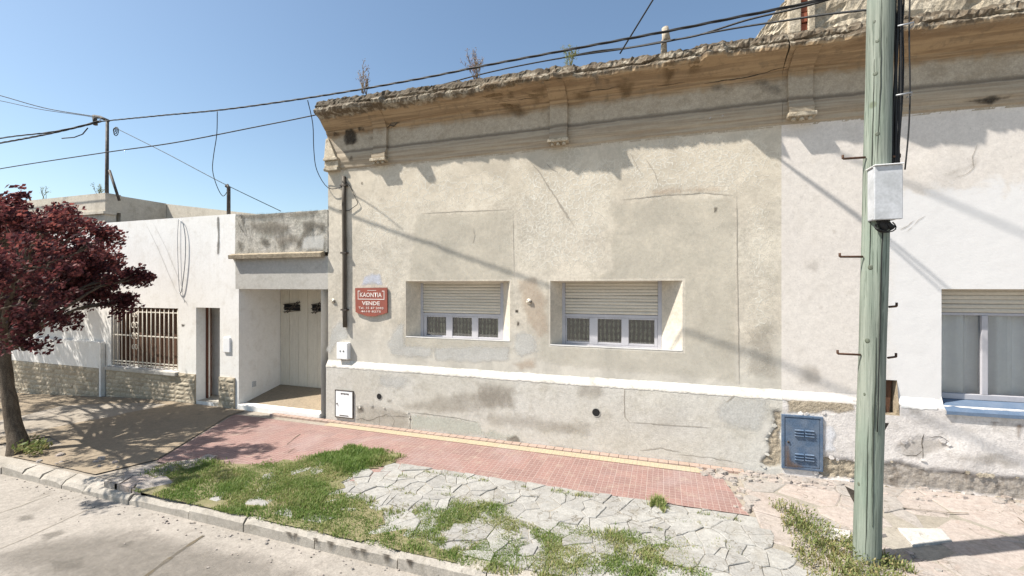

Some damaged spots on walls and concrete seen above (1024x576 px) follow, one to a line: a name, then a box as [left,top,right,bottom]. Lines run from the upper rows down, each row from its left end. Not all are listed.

crack [358,147,771,370]
peeling [759,400,856,469]
spalling [814,455,855,481]
spalling [884,459,1024,499]